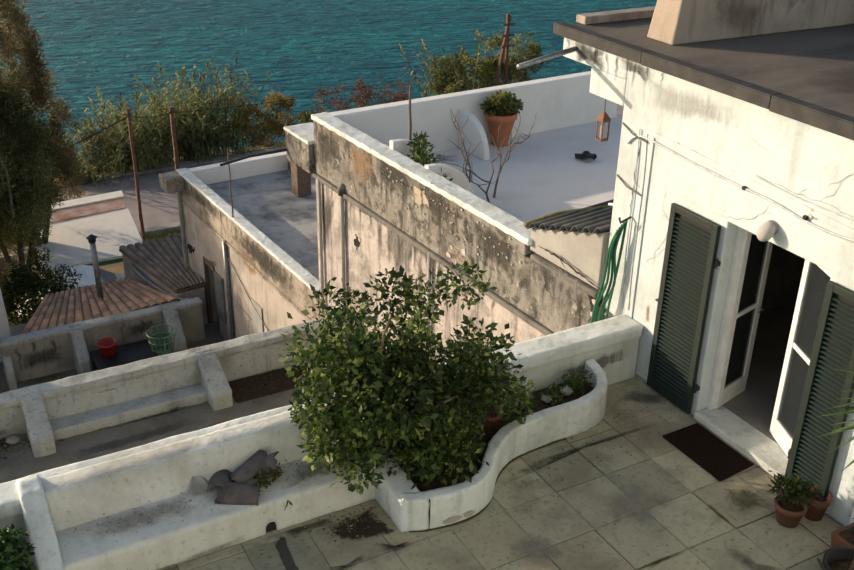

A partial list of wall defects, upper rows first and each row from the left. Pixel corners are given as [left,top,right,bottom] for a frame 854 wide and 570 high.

water stain [577,44,648,80]
water stain [315,124,335,157]
water stain [347,149,406,193]
water stain [321,191,332,239]
water stain [350,204,471,284]
water stain [414,183,513,281]
crack [722,174,854,220]
water stain [533,266,581,306]
water stain [15,341,57,367]